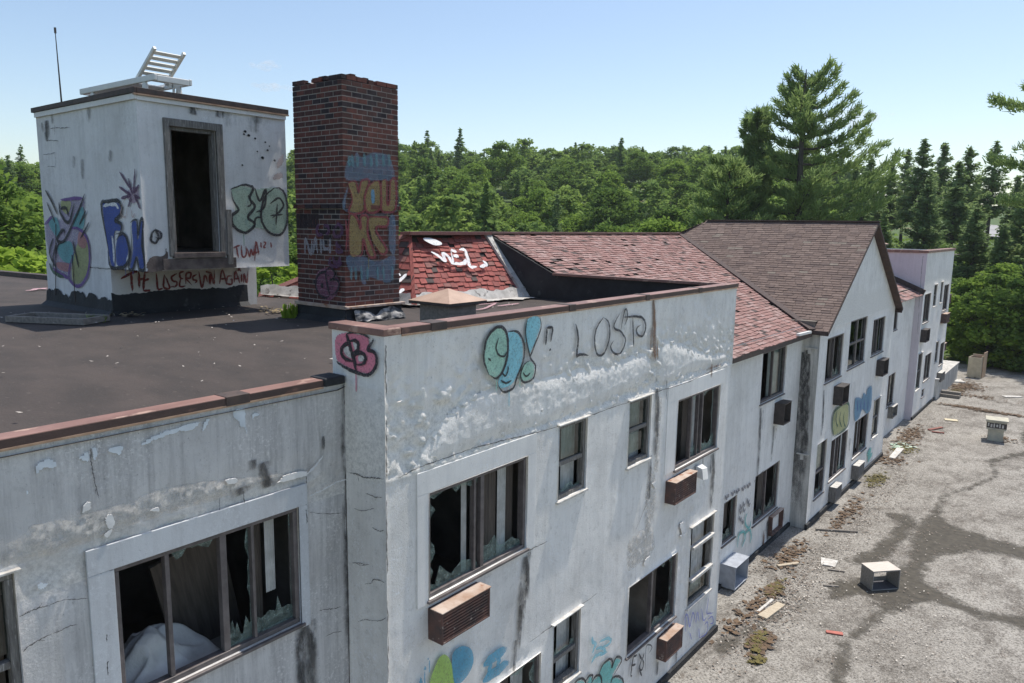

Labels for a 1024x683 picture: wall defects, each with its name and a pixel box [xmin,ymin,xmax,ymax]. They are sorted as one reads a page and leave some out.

peeling [79,446,123,462]
peeling [141,419,210,445]
peeling [233,408,260,433]
water stain [252,460,271,487]
flaking render [279,471,309,482]
water stain [649,382,667,498]
water stain [793,350,810,472]
flaking render [7,478,254,562]
crack [306,420,558,680]
water stain [513,556,530,671]